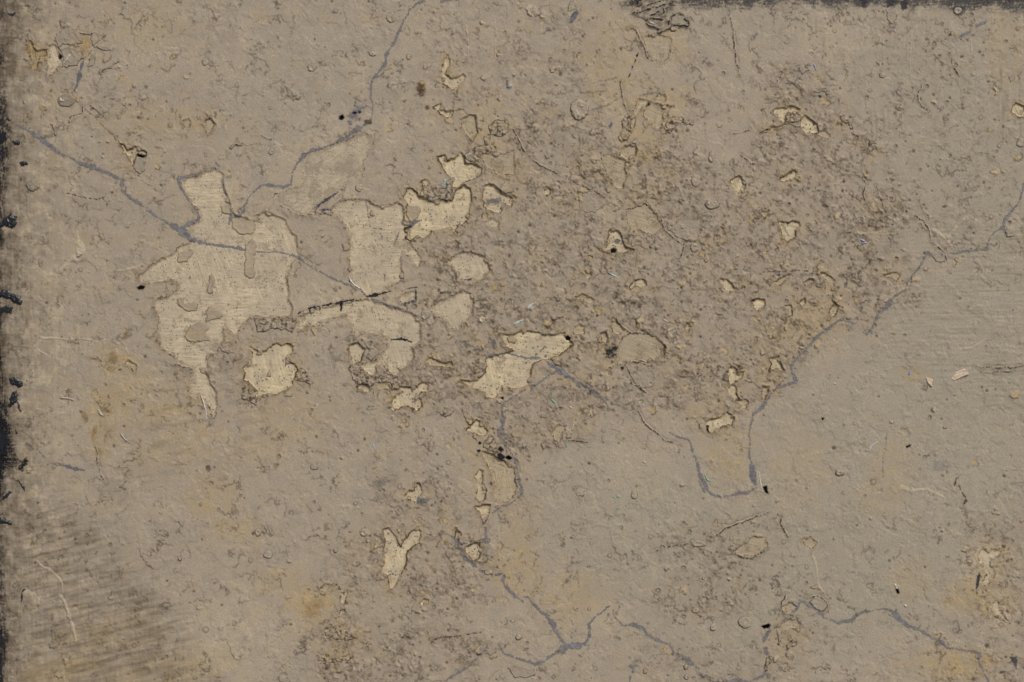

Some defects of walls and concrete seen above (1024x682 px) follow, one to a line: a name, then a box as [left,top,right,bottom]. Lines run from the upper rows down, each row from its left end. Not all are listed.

crack [16,0,472,343]
peeling [138,129,560,417]
peeling [381,526,421,590]
peeling [474,452,517,524]
peeling [463,325,585,398]
crack [431,339,989,682]
crack [670,183,1024,498]